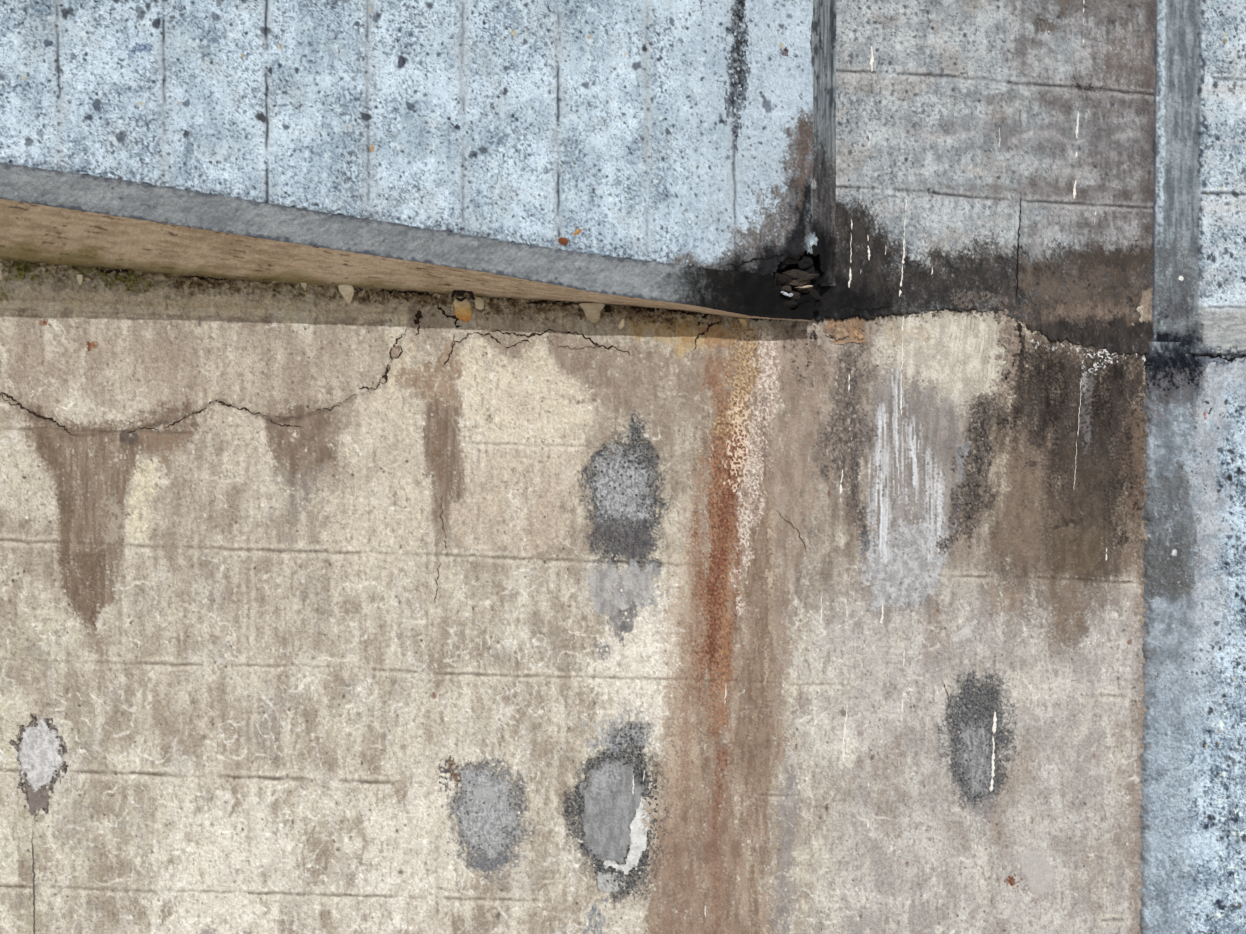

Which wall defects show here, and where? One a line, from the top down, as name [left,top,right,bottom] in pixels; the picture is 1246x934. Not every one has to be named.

water stain [722,0,754,153]
crack [97,267,129,275]
crack [184,274,228,282]
crack [0,392,73,435]
water stain [11,396,218,681]
water stain [259,398,343,560]
crack [127,288,721,433]
water stain [389,322,708,662]
peeling [773,254,1029,554]
water stain [656,101,1246,726]
corrosion [618,308,796,934]
spalling [9,713,71,820]